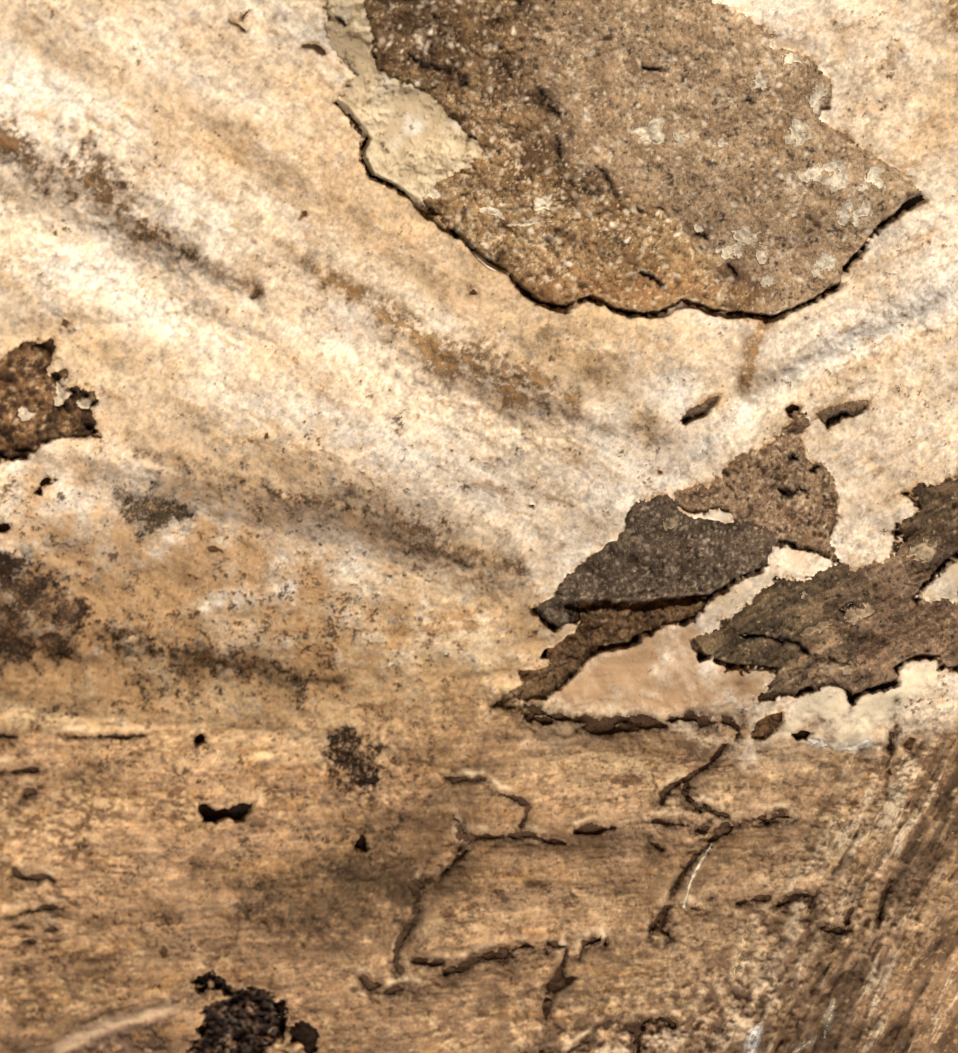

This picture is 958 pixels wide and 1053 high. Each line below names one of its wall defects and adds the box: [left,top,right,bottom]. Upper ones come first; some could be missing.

flaking render [324,0,923,317]
flaking render [0,338,100,462]
peeling [496,396,958,706]
flaking render [186,970,292,1053]
crack [359,699,895,1053]
flaking render [751,712,783,739]